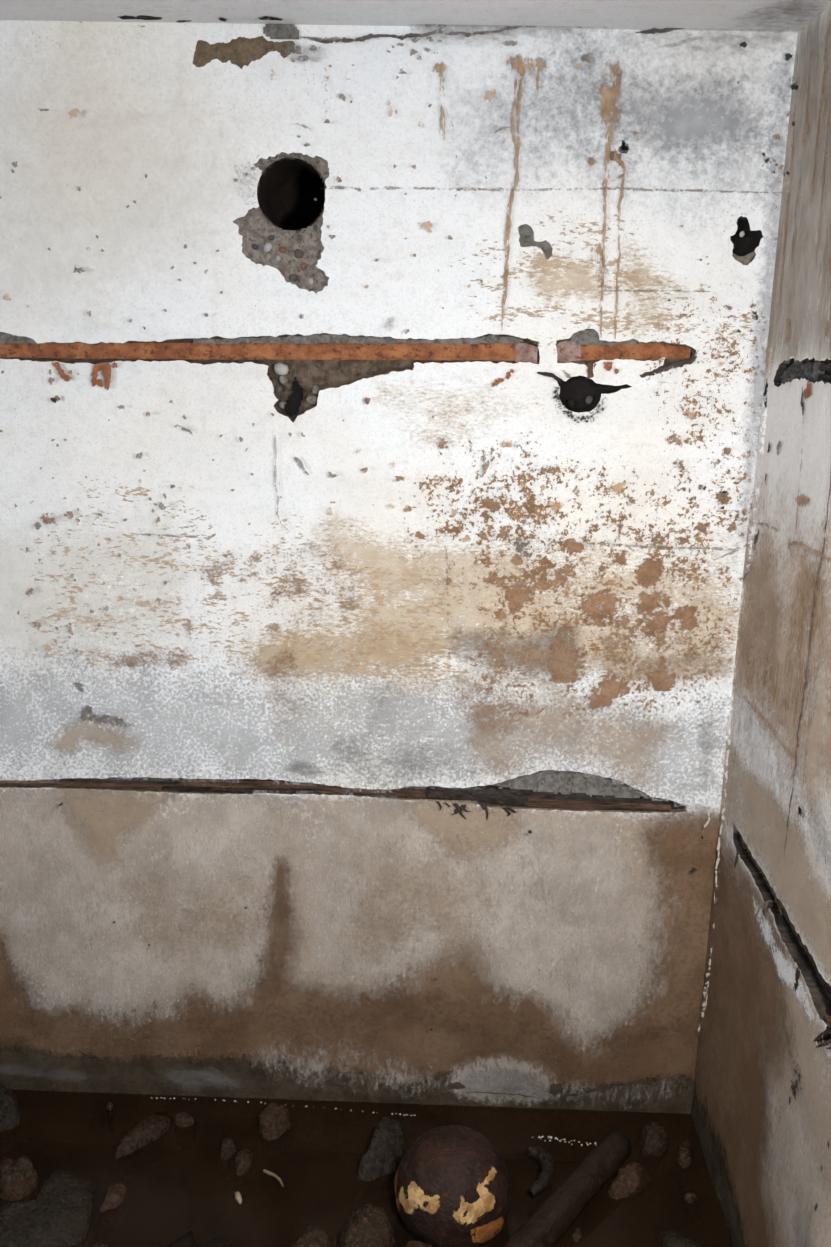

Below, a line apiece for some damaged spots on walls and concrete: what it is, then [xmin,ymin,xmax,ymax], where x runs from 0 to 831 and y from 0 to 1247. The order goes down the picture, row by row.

peeling [193,16,317,69]
spalling [233,123,358,294]
rust [501,54,546,331]
rust [587,360,619,374]
rust [588,61,626,339]
hole [730,217,761,265]
crack [761,379,769,409]
peeling [0,286,831,1057]
crack [551,472,831,850]
damp [0,498,831,1247]